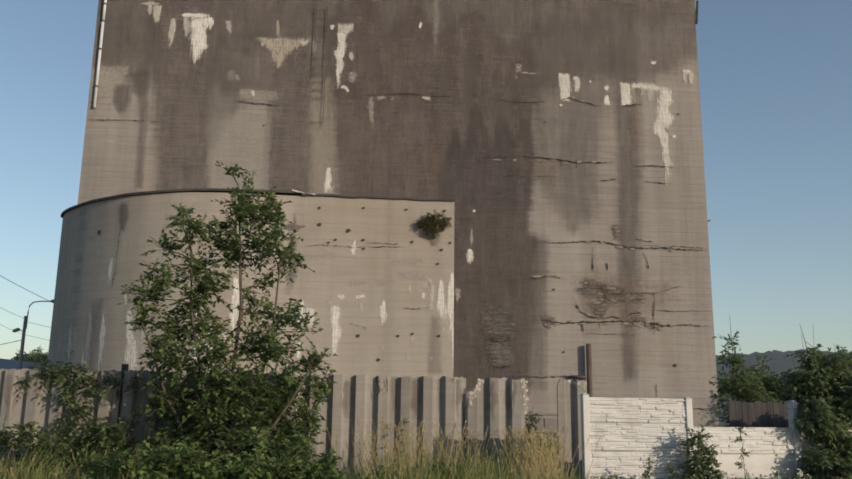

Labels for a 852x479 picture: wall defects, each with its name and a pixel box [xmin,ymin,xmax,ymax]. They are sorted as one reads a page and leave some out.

crack [484,156,618,181]
damp [97,0,697,391]
crack [544,238,708,271]
crack [531,294,708,335]
spalling [577,277,679,330]